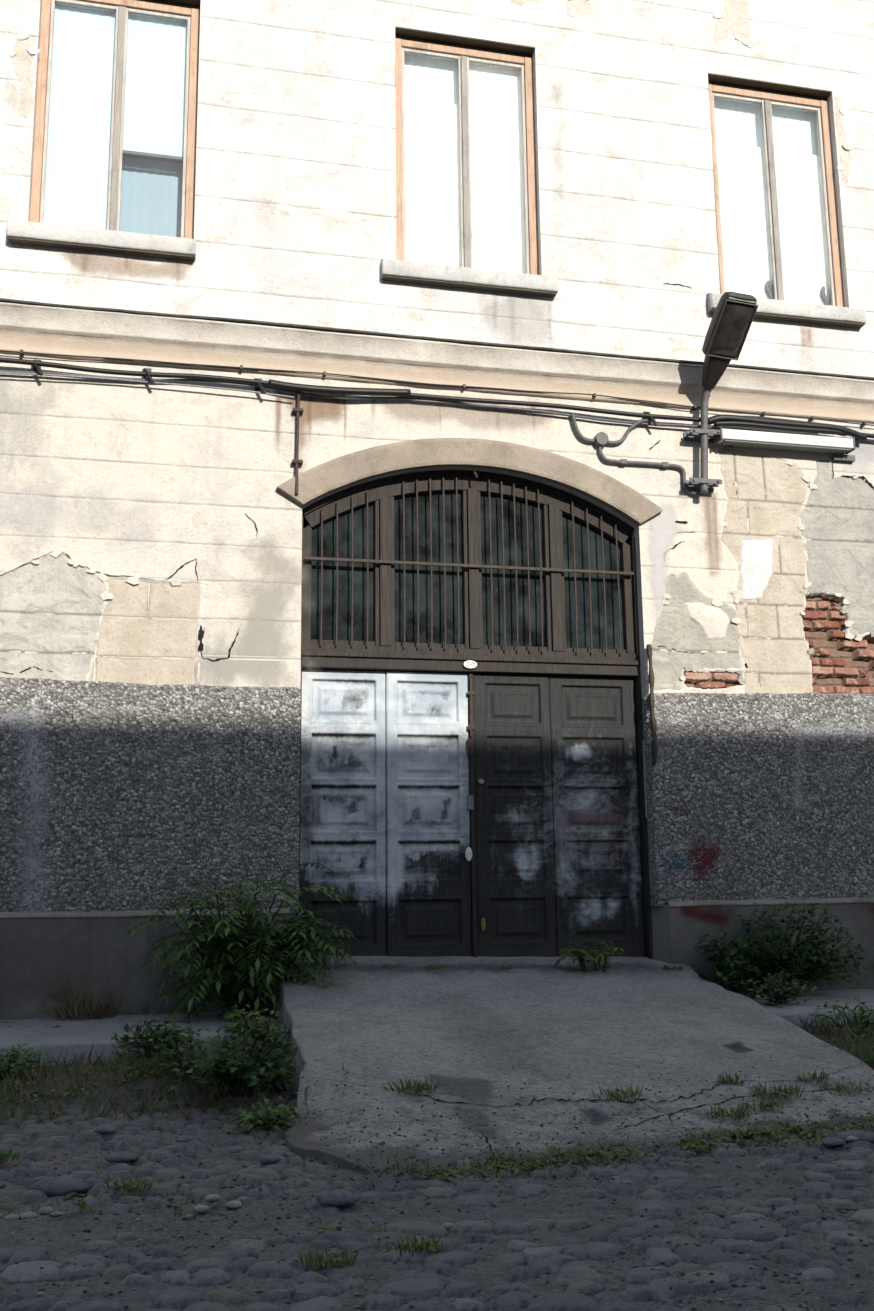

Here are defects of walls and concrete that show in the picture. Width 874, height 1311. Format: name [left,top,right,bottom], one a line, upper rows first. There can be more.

peeling [713,0,755,48]
crack [0,658,53,675]
peeling [0,550,114,681]
crack [0,552,198,580]
crack [200,629,239,662]
peeling [645,574,748,690]
peeling [786,460,874,694]
crack [298,1065,873,1156]